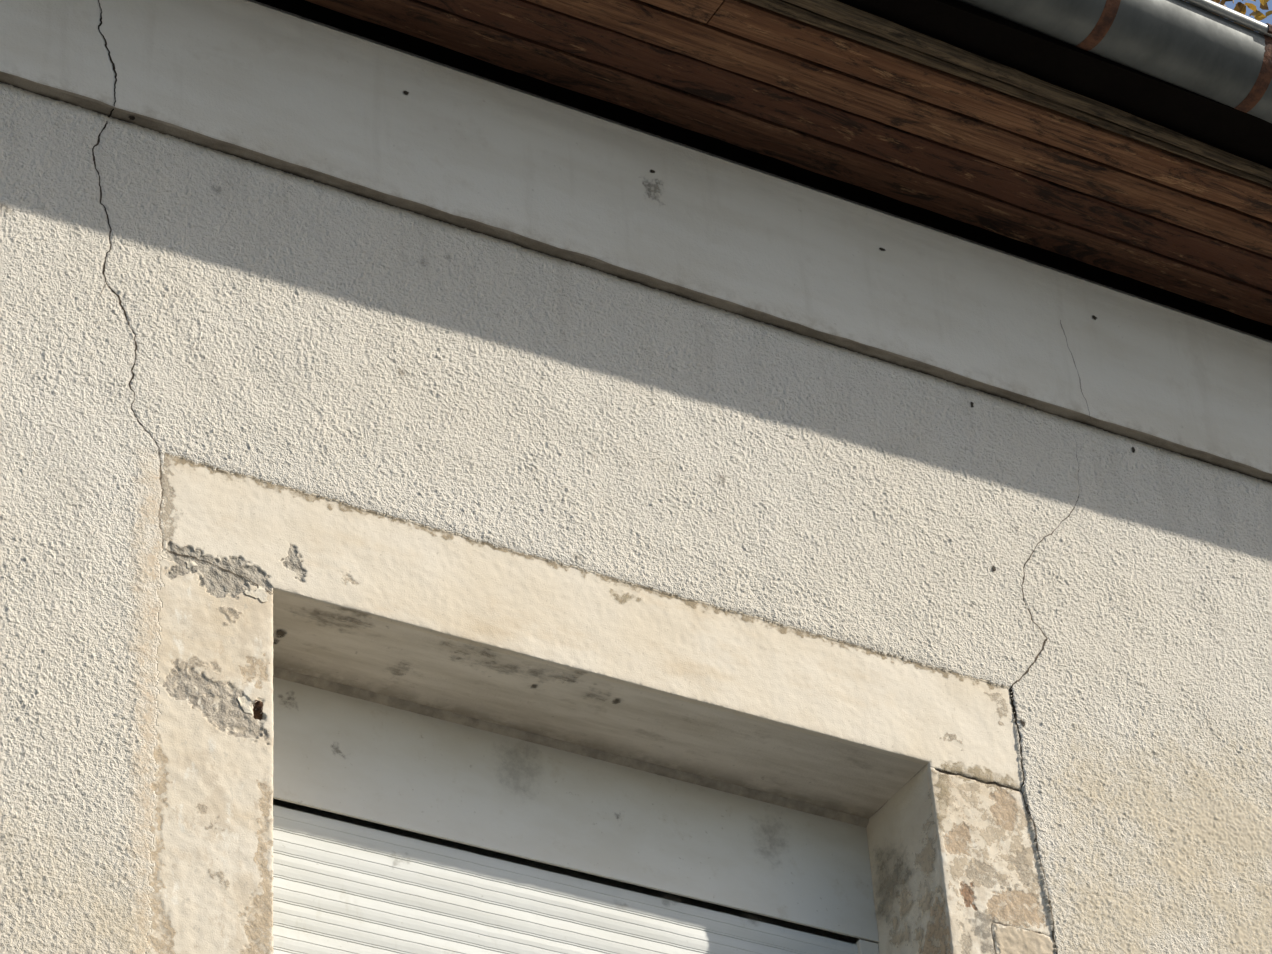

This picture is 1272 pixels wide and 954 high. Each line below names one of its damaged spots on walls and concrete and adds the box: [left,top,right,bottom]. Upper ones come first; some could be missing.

crack [92,0,273,594]
spalling [159,460,273,602]
spalling [163,654,269,739]
crack [935,440,1080,954]